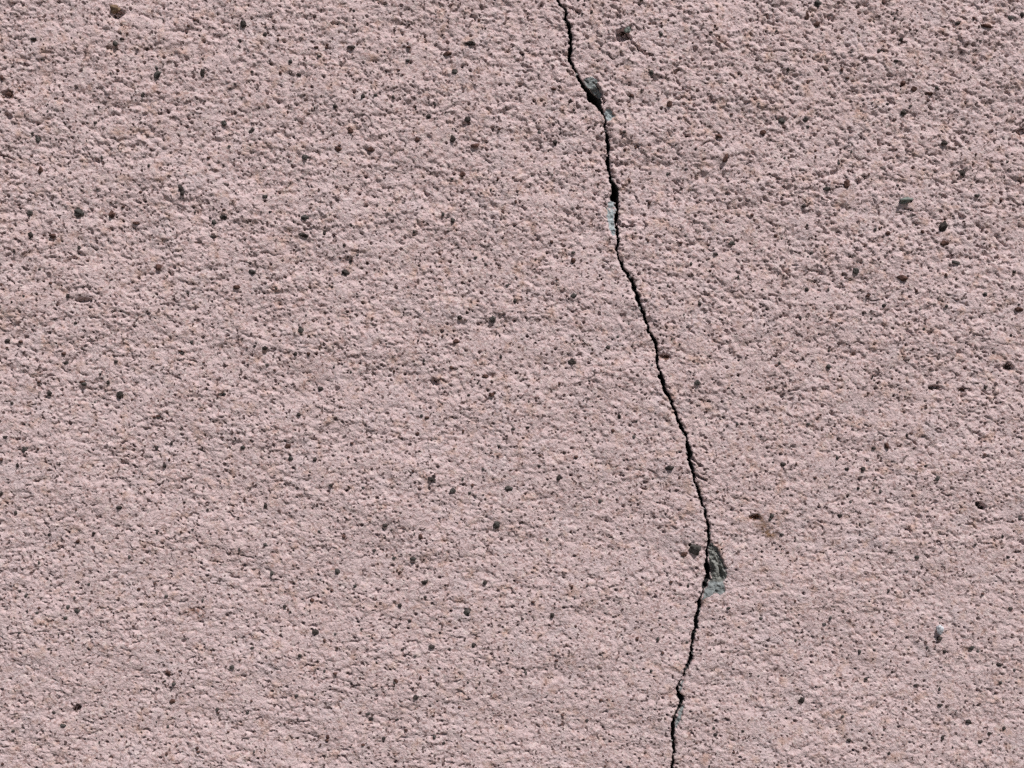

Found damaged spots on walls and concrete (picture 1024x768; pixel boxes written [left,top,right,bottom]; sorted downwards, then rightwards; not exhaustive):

crack [556,0,711,768]